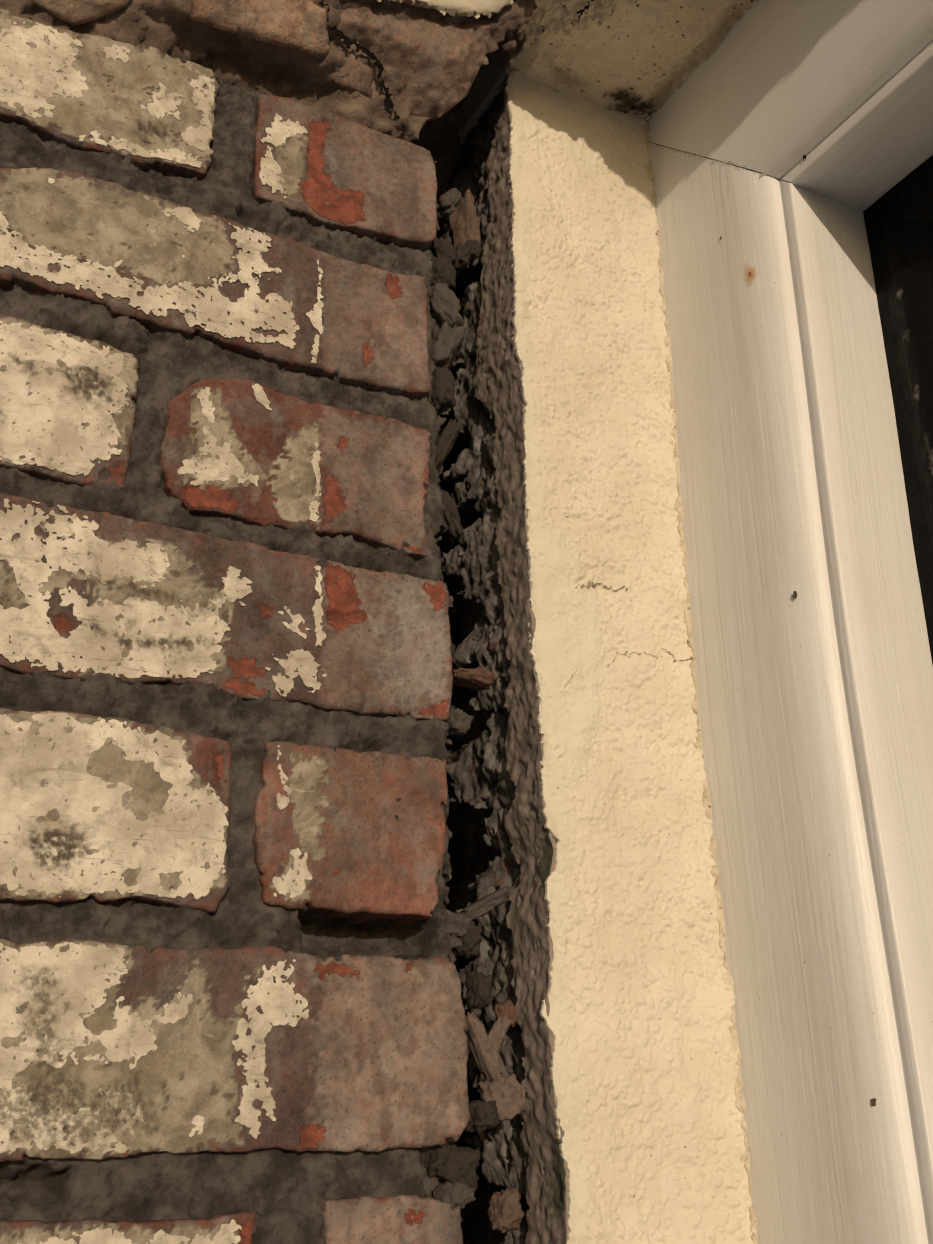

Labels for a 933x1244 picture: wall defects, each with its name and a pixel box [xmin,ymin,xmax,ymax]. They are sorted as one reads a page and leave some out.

peeling [0,9,217,169]
crack [319,0,408,133]
leakage [604,88,651,116]
peeling [0,167,324,364]
peeling [0,317,138,485]
peeling [177,384,347,529]
peeling [0,498,368,697]
crack [423,188,527,1244]
peeling [0,709,229,900]
peeling [269,745,329,902]
peeling [0,939,309,1159]
peeling [0,1219,254,1244]